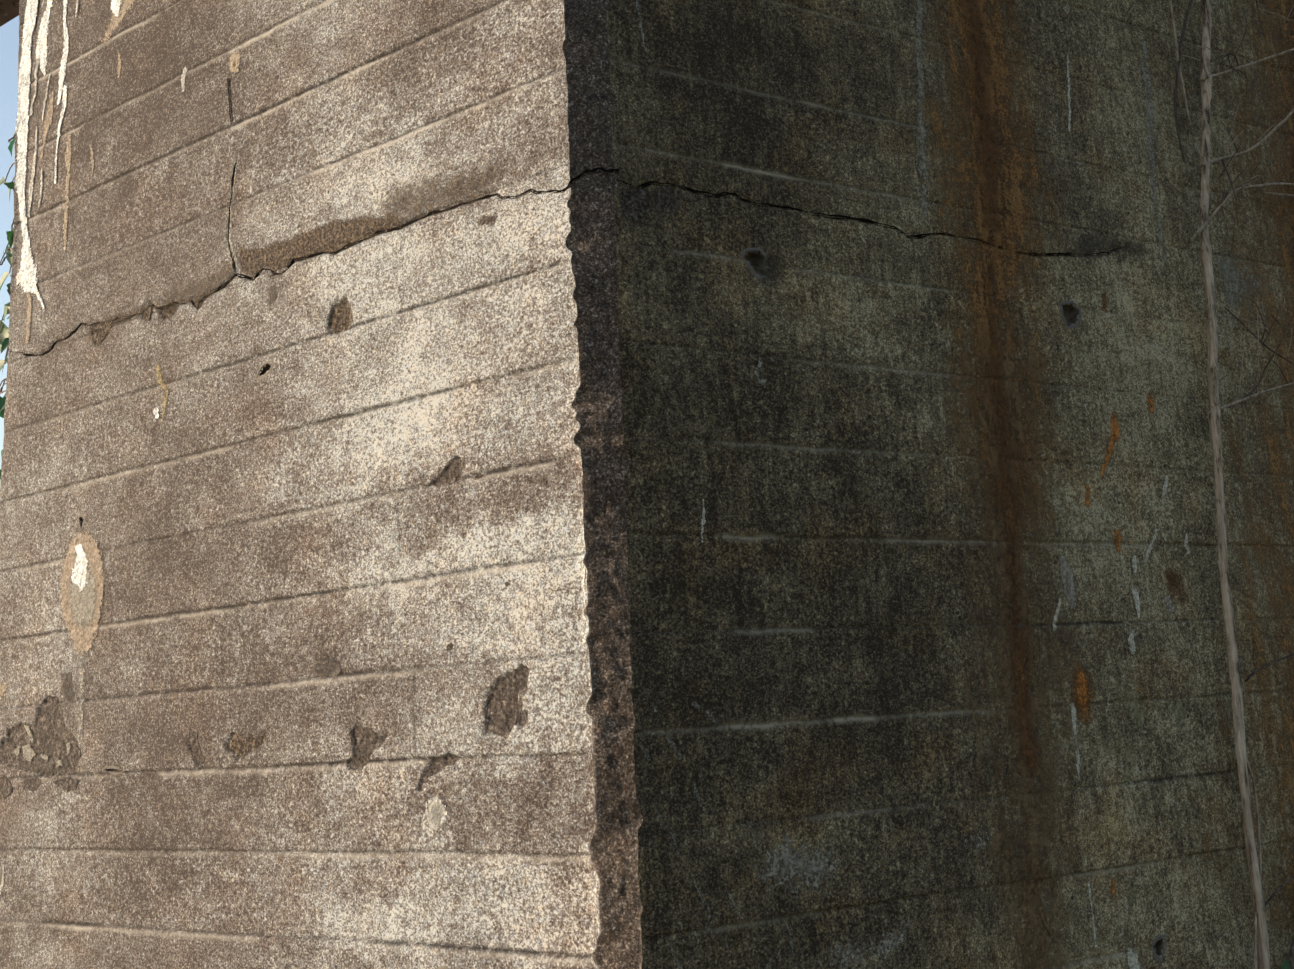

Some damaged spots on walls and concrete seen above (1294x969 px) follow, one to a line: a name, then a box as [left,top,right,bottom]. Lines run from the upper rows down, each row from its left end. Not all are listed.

leakage [101,0,135,45]
leakage [15,0,78,344]
spalling [89,164,503,346]
crack [10,160,1125,356]
peeling [0,696,82,799]
peeling [484,665,530,737]